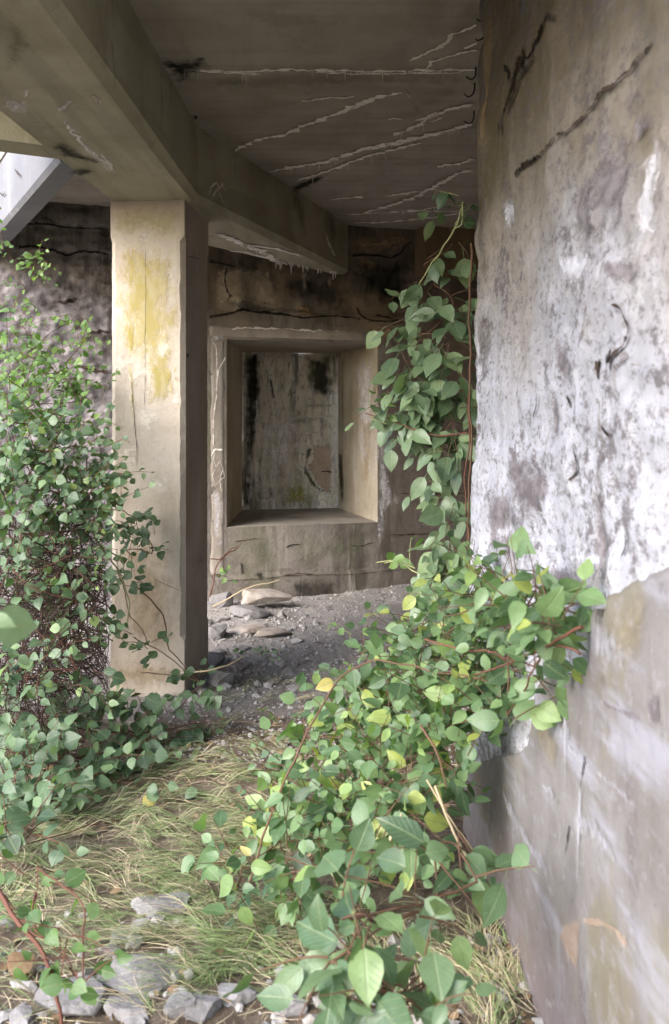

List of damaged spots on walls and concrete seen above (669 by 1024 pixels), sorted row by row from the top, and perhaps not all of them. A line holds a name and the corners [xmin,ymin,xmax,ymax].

crack [64,120,116,172]
water stain [163,58,202,81]
crack [166,24,477,181]
crack [498,13,555,130]
crack [512,44,652,177]
water stain [245,355,291,505]
water stain [308,357,332,396]
crack [188,158,475,495]